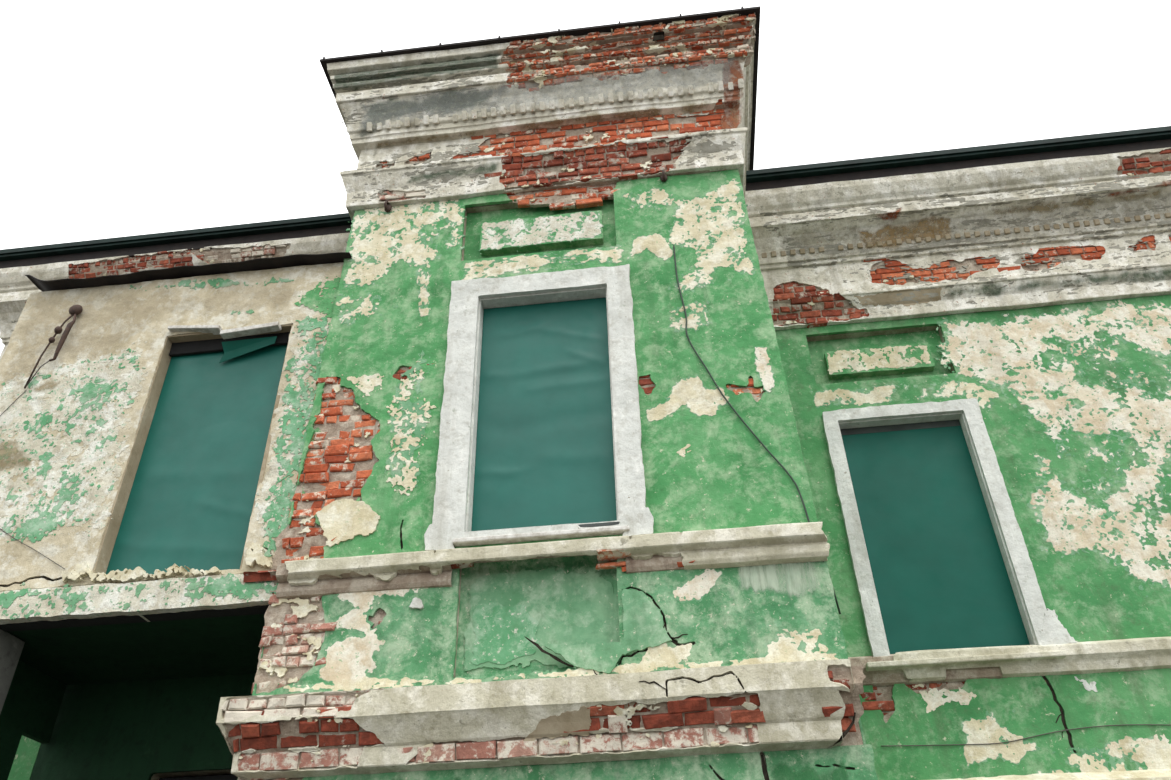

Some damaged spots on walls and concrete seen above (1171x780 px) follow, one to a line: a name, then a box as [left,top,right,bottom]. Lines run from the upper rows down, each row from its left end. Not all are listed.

flaking render [340,13,756,124]
peeling [760,150,1171,597]
peeling [0,99,850,780]
crack [0,576,62,587]
crack [525,587,746,696]
peeling [822,681,1171,774]
flaking render [1039,608,1077,645]
crack [1042,676,1076,753]
peeling [1074,676,1098,692]